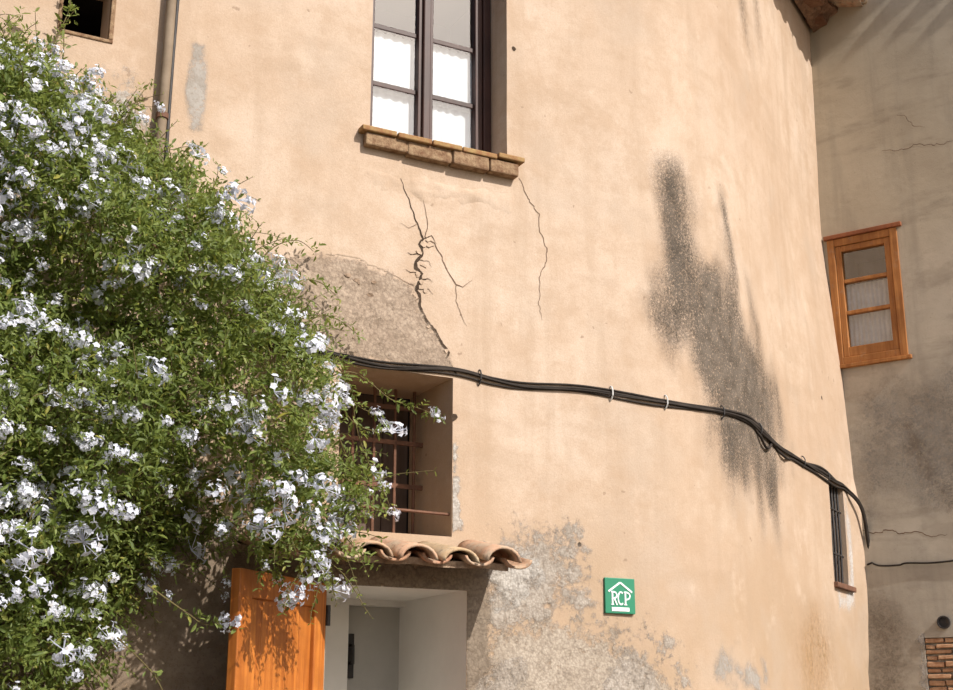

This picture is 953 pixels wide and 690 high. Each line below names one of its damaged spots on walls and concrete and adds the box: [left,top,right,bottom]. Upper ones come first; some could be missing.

water stain [186,44,207,129]
spalling [242,249,452,367]
crack [392,180,472,374]
crack [519,179,548,315]
water stain [650,168,782,511]
flaking render [476,522,691,690]